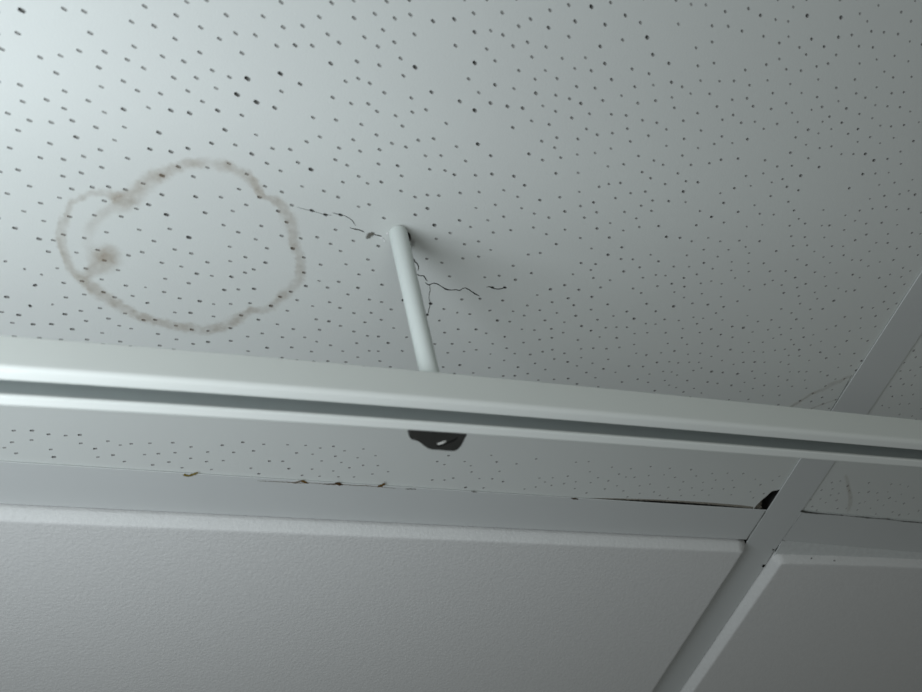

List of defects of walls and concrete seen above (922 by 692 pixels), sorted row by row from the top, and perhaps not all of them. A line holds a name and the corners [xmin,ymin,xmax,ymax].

crack [298,207,382,239]
crack [413,258,506,316]